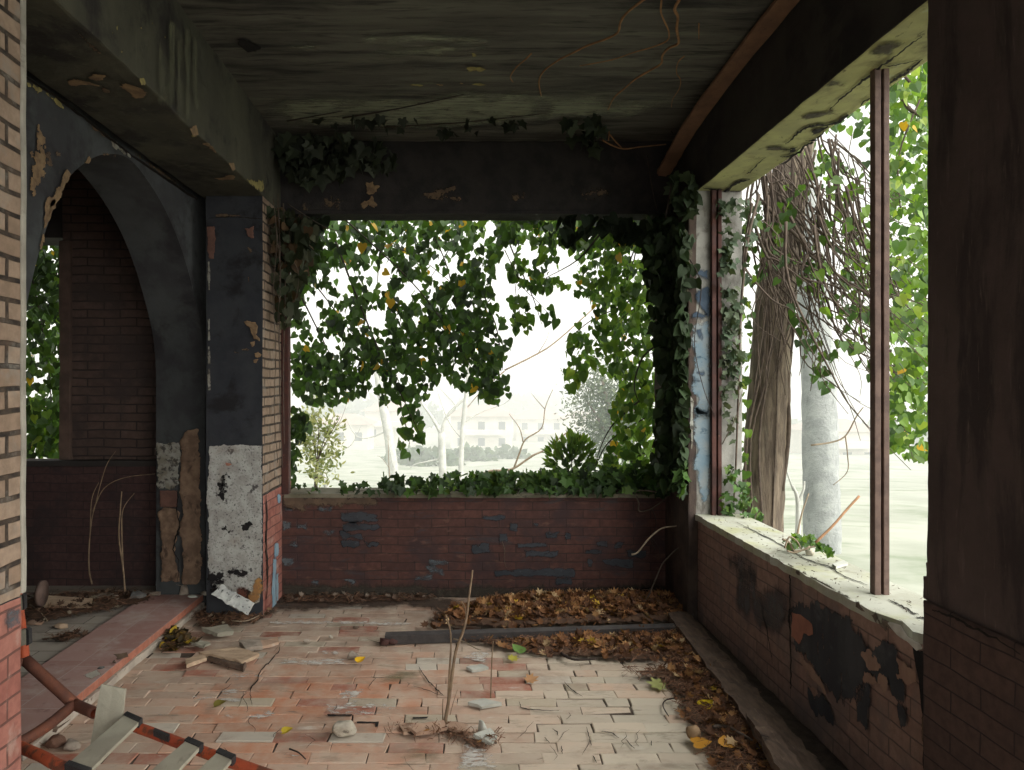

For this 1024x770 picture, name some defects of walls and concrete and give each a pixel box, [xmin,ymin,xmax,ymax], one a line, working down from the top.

flaking render [30,124,71,249]
spalling [68,74,147,99]
flaking render [361,182,380,209]
crack [704,37,923,192]
peeling [155,428,263,603]
peeling [788,564,922,730]